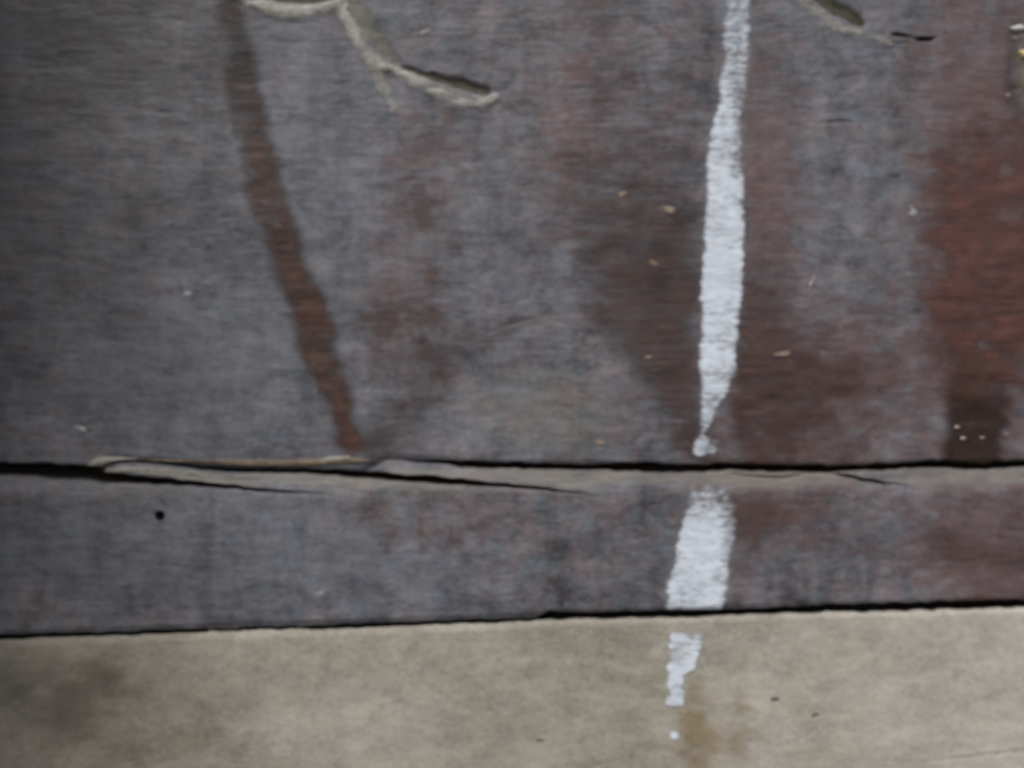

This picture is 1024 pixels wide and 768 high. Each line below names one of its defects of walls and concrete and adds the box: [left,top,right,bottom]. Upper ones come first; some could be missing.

crack [891,33,935,42]
rust [220,0,363,452]
damp [582,0,750,460]
crack [0,459,1024,493]
damp [666,494,732,610]
crack [0,599,1024,639]
damp [665,633,701,706]